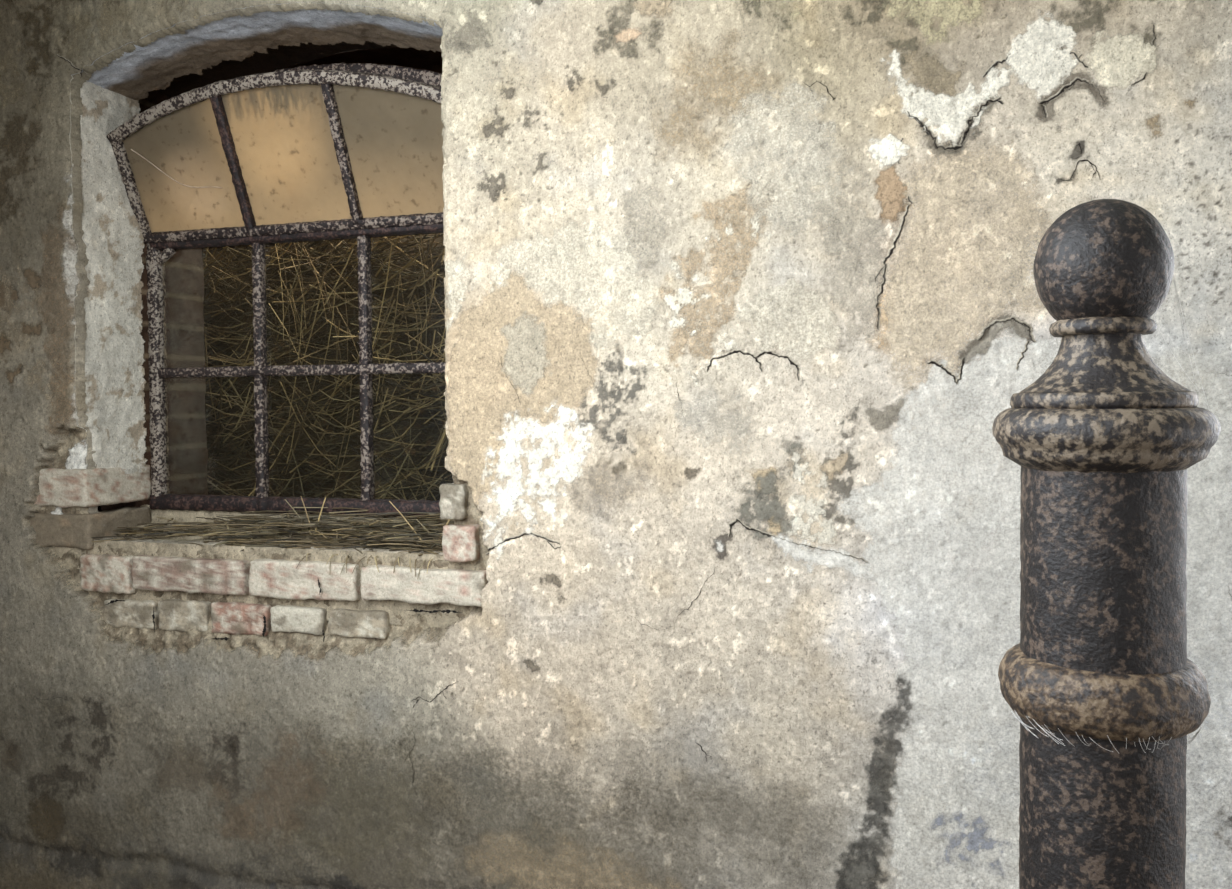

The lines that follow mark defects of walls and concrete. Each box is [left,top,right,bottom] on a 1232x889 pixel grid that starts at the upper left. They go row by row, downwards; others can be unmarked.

flaking render [482,81,547,143]
flaking render [566,65,616,96]
crack [874,196,913,329]
flaking render [28,168,666,661]
crack [706,350,800,381]
peeling [661,12,1157,889]
crack [927,316,1036,384]
crack [631,518,868,630]
peeling [1154,350,1232,889]
water stain [0,697,635,889]
water stain [865,738,891,818]
water stain [838,845,877,889]